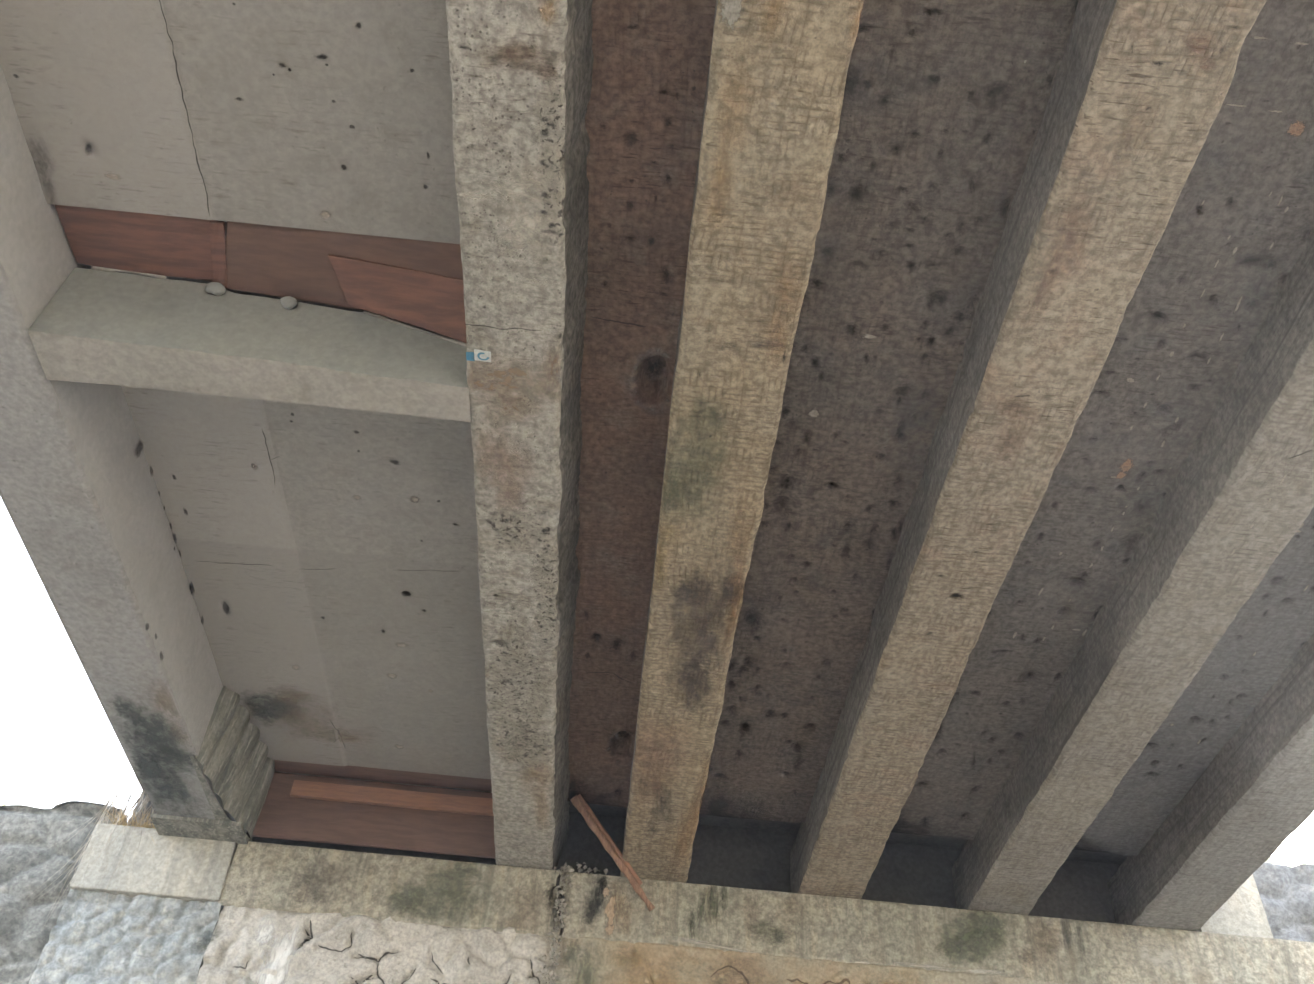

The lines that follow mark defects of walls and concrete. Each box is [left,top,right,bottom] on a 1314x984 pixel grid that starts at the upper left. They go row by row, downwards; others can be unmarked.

water stain [675,580,744,705]
water stain [115,703,195,814]
crack [550,874,564,942]
crack [297,920,470,984]
crack [711,965,749,984]
crack [787,976,850,984]
water stain [904,912,1001,974]